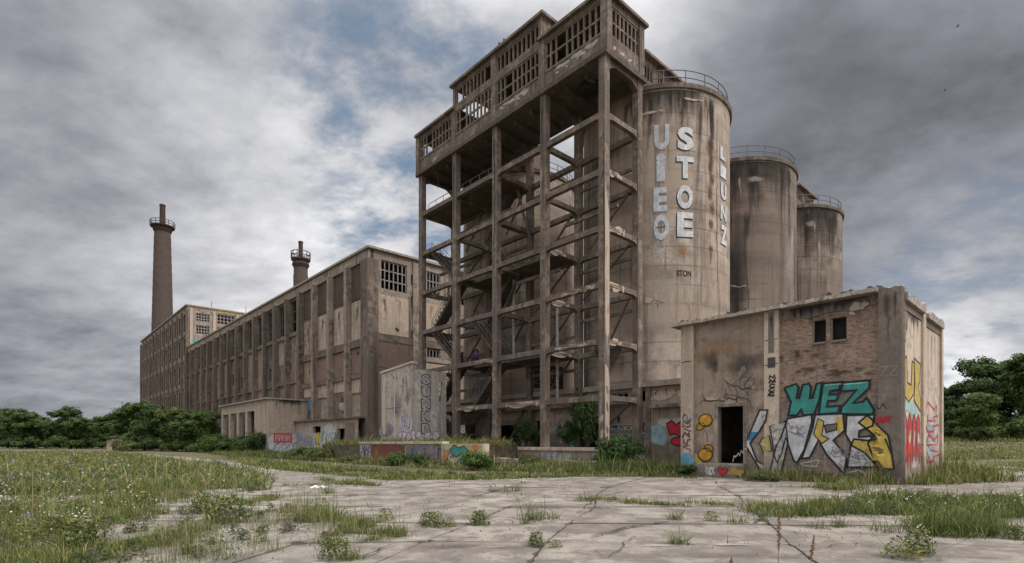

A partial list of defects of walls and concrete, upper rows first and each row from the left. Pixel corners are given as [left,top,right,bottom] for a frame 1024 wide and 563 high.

leakage [625,90,714,136]
leakage [730,162,790,192]
leakage [792,208,836,246]
leakage [730,217,749,313]
crack [701,338,778,406]
crack [512,489,666,557]